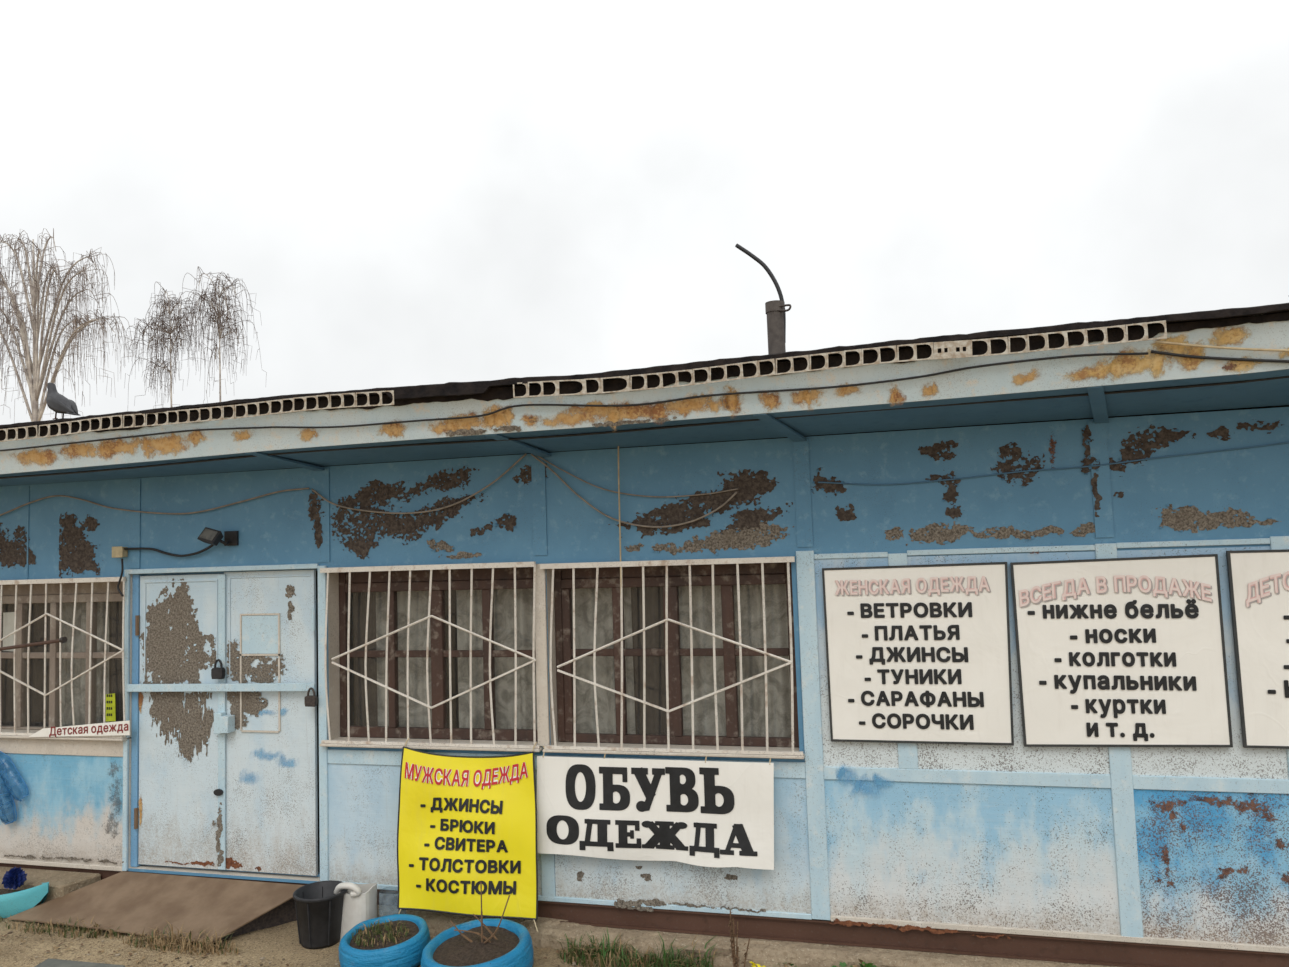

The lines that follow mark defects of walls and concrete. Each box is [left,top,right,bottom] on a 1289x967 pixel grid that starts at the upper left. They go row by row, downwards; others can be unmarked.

peeling [0,523,36,569]
peeling [58,512,103,578]
peeling [307,465,517,560]
peeling [608,469,797,555]
peeling [884,419,1284,546]
peeling [139,578,289,763]
corrosion [1149,793,1280,832]
corrosion [1155,840,1175,888]
corrosion [1218,864,1250,879]